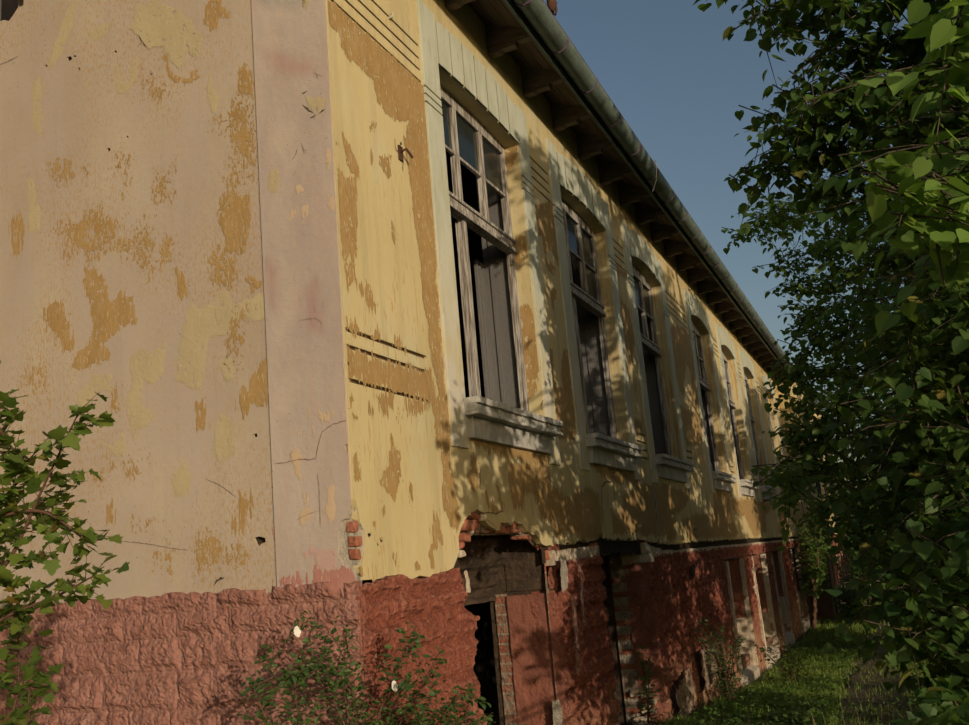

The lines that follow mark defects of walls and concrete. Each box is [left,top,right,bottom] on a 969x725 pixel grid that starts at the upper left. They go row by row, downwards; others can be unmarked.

peeling [203,0,231,32]
peeling [6,209,29,258]
peeling [43,137,188,413]
peeling [200,60,280,420]
peeling [328,0,797,593]
peeling [195,398,210,431]
crack [275,420,346,529]
spalling [299,433,413,586]